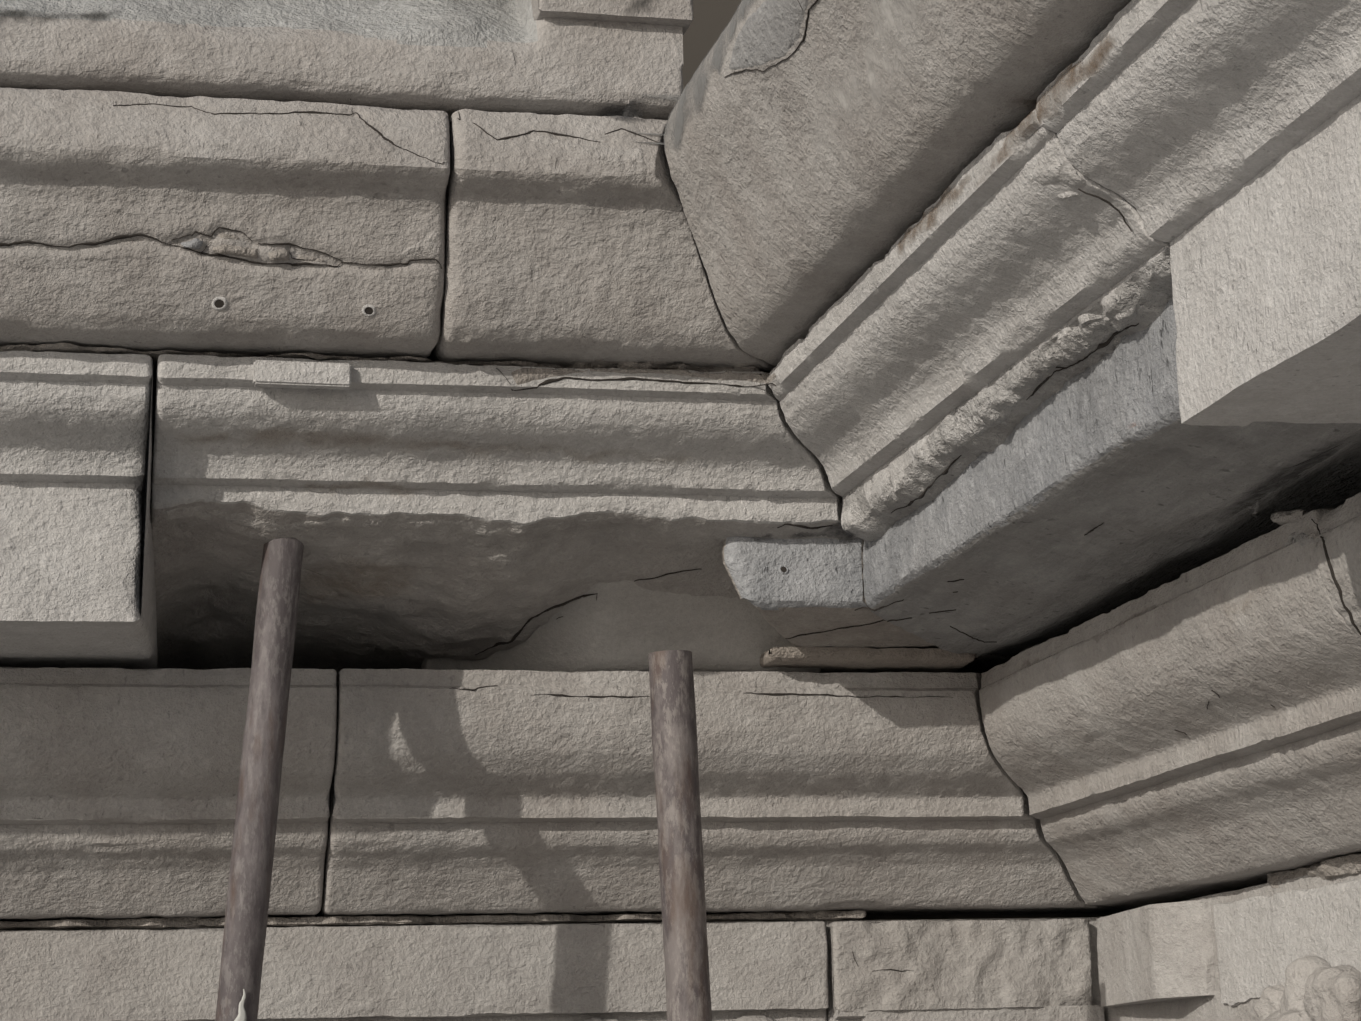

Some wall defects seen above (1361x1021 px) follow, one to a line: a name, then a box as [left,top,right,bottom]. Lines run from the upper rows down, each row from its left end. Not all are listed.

crack [725,0,818,77]
crack [113,99,444,164]
crack [449,112,660,143]
crack [1078,188,1132,232]
crack [0,227,442,269]
crack [634,569,702,582]
crack [1311,519,1361,635]
crack [475,593,598,655]
crack [449,684,498,692]
crack [535,692,649,700]
crack [747,691,953,699]